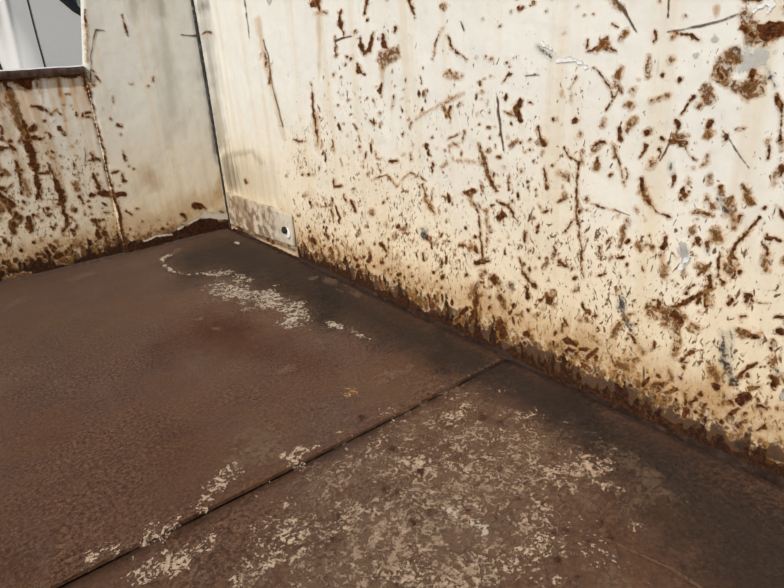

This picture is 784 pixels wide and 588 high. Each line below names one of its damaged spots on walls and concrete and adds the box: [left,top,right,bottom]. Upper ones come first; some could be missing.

rust [334,29,400,76]
rust [586,23,629,53]
damp [184,242,432,347]